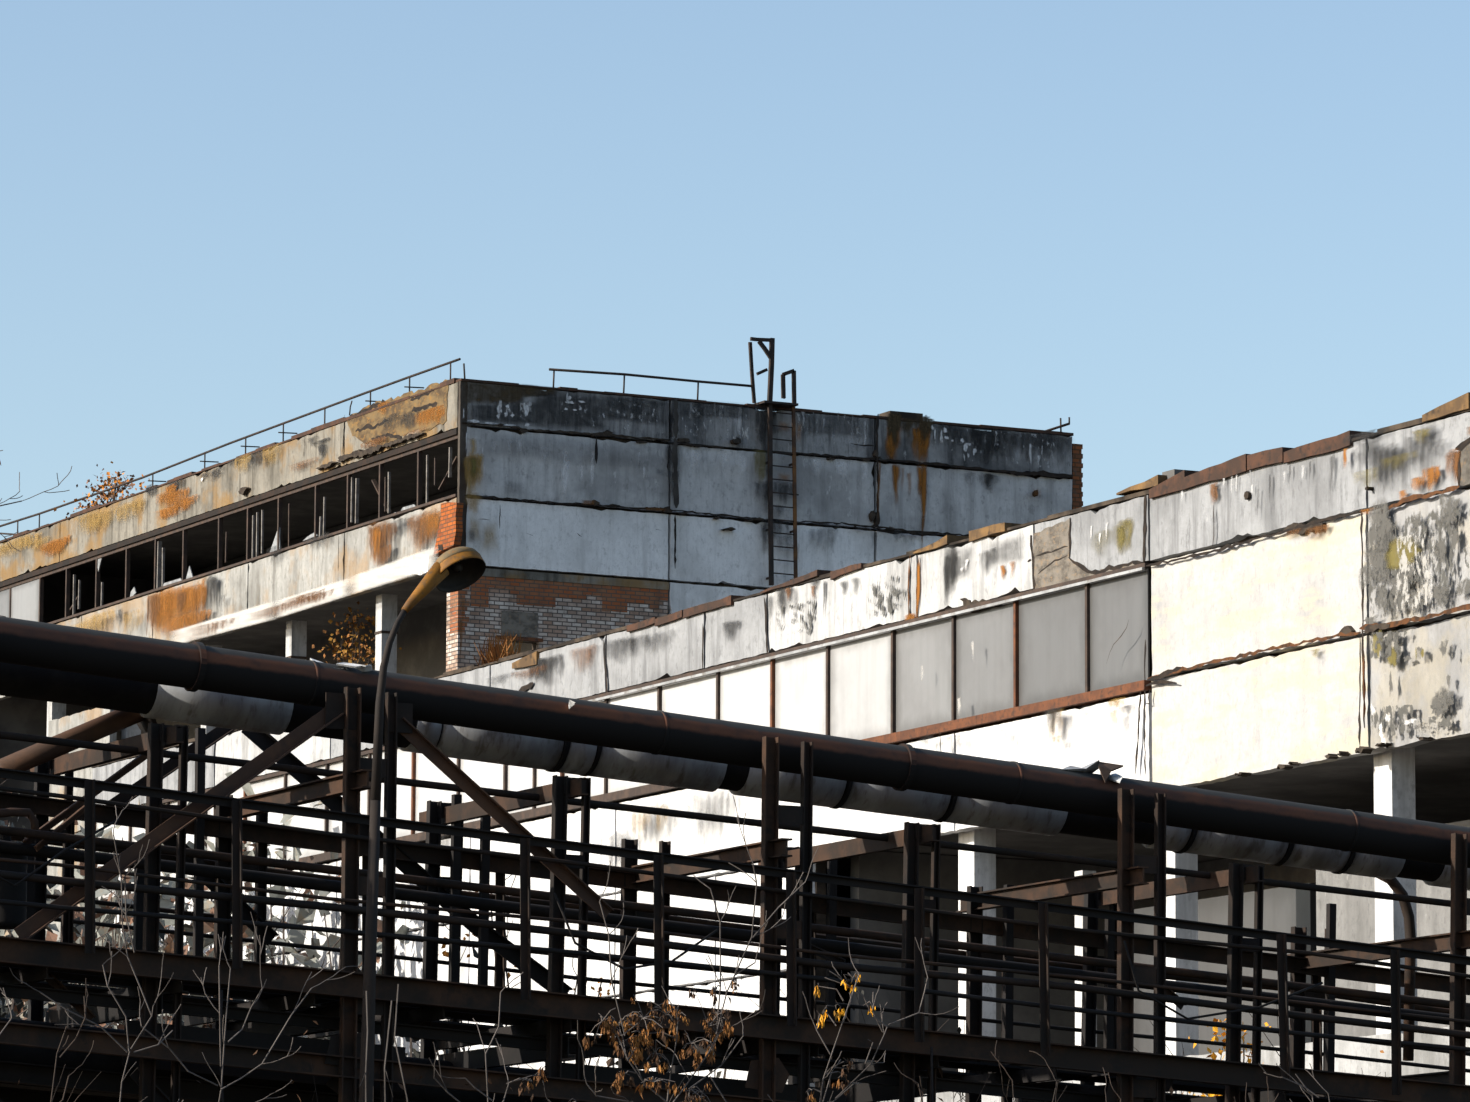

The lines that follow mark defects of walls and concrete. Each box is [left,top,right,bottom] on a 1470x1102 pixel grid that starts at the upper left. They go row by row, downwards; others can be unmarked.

damp [468,383,793,501]
corrosion [160,485,191,517]
corrosion [886,413,934,543]
corrosion [369,522,391,562]
corrosion [410,511,440,548]
damp [945,556,968,593]
spalling [1033,518,1143,589]
corrosion [148,579,209,631]
peeling [1325,443,1470,759]